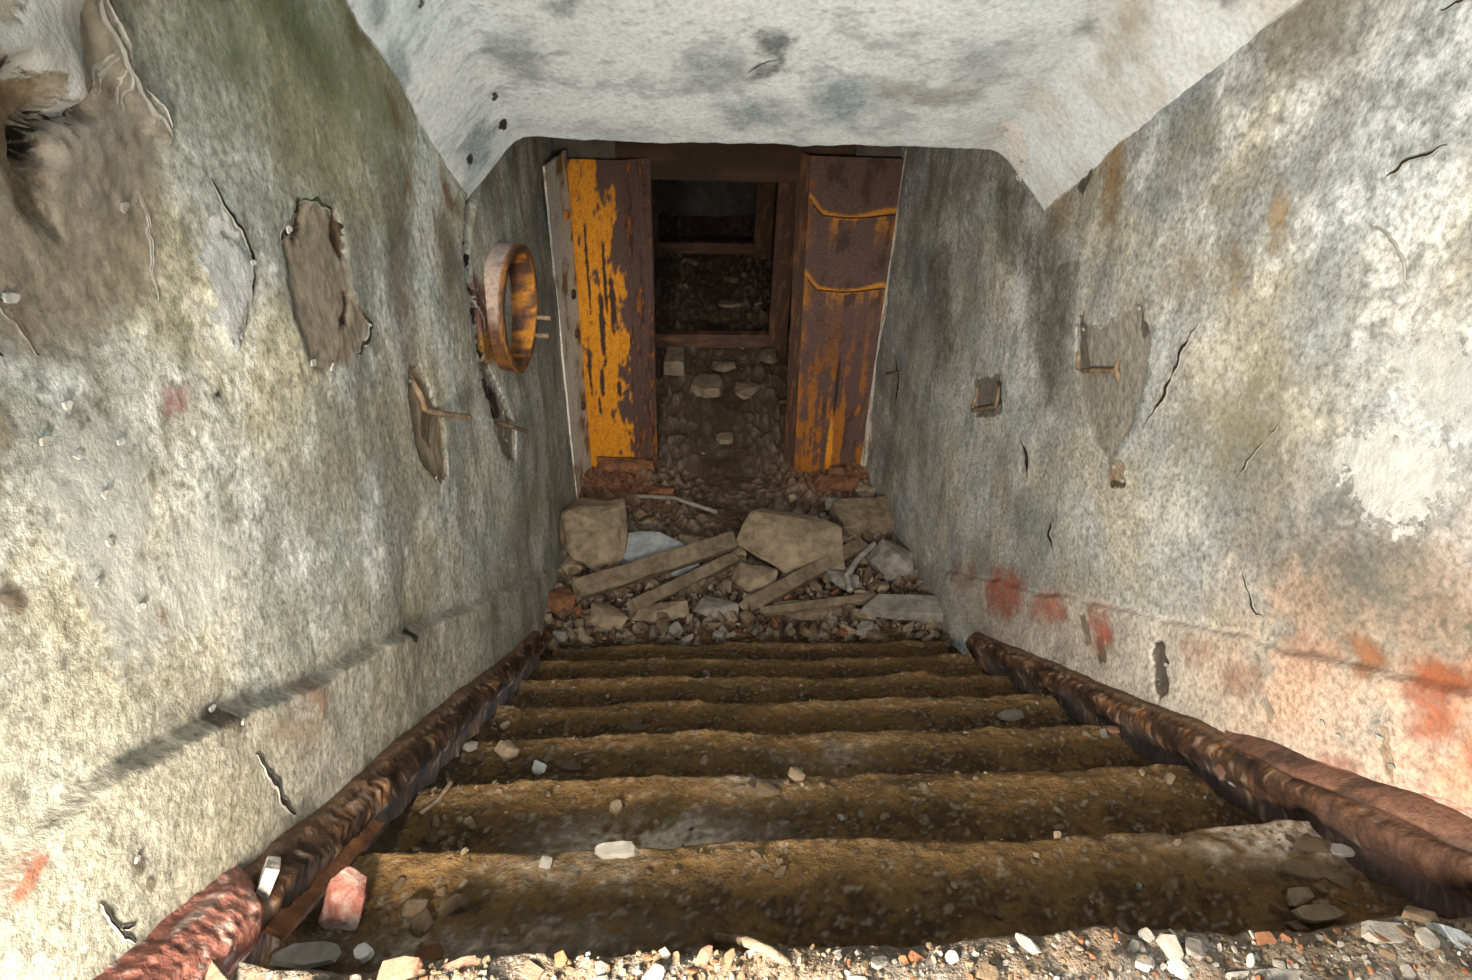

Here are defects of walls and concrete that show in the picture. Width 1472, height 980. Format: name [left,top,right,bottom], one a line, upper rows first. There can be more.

crack [1440,0,1466,11]
spalling [0,55,163,228]
crack [1384,144,1447,180]
spalling [2,292,21,304]
spalling [283,202,367,371]
crack [1144,322,1198,425]
spalling [407,364,472,483]
corrosion [986,569,1066,621]
spalling [1151,640,1169,699]
corrosion [1414,664,1472,736]
crack [256,752,296,816]